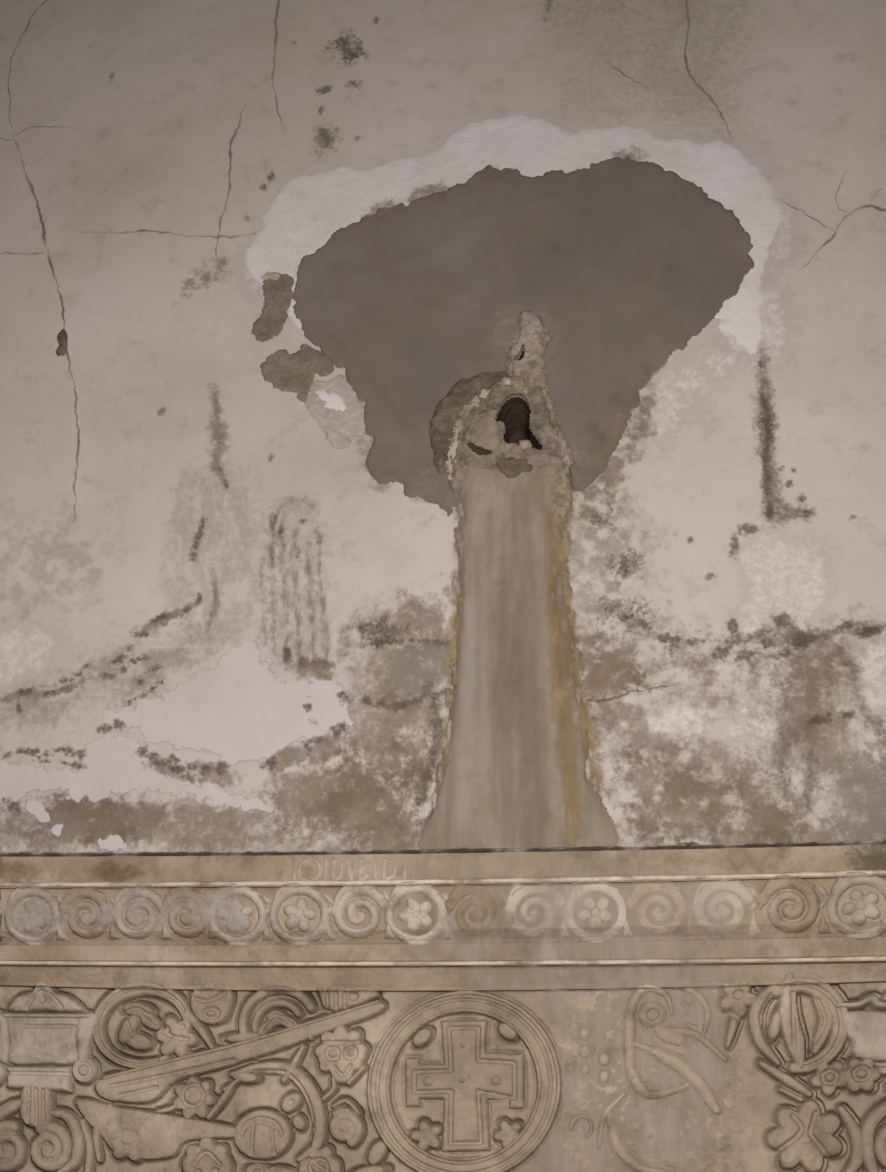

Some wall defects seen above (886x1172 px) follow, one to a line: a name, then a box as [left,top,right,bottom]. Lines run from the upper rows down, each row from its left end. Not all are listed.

crack [30,184,69,359]
damp [211,393,225,471]
peeling [252,272,365,449]
spalling [428,309,575,522]
peeling [0,623,88,712]
peeling [135,594,202,637]
peeling [0,638,354,836]
damp [0,462,886,870]
peeling [97,835,127,852]